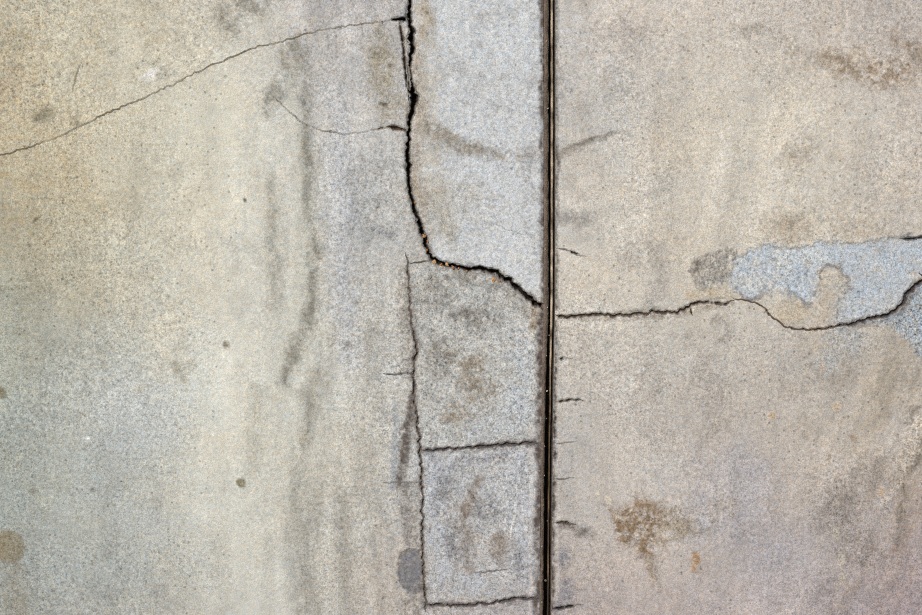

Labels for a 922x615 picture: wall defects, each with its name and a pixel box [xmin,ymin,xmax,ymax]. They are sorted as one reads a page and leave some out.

crack [0,0,547,612]
crack [556,248,587,257]
crack [554,273,922,332]
peeling [687,231,922,363]
corrosion [594,486,704,595]